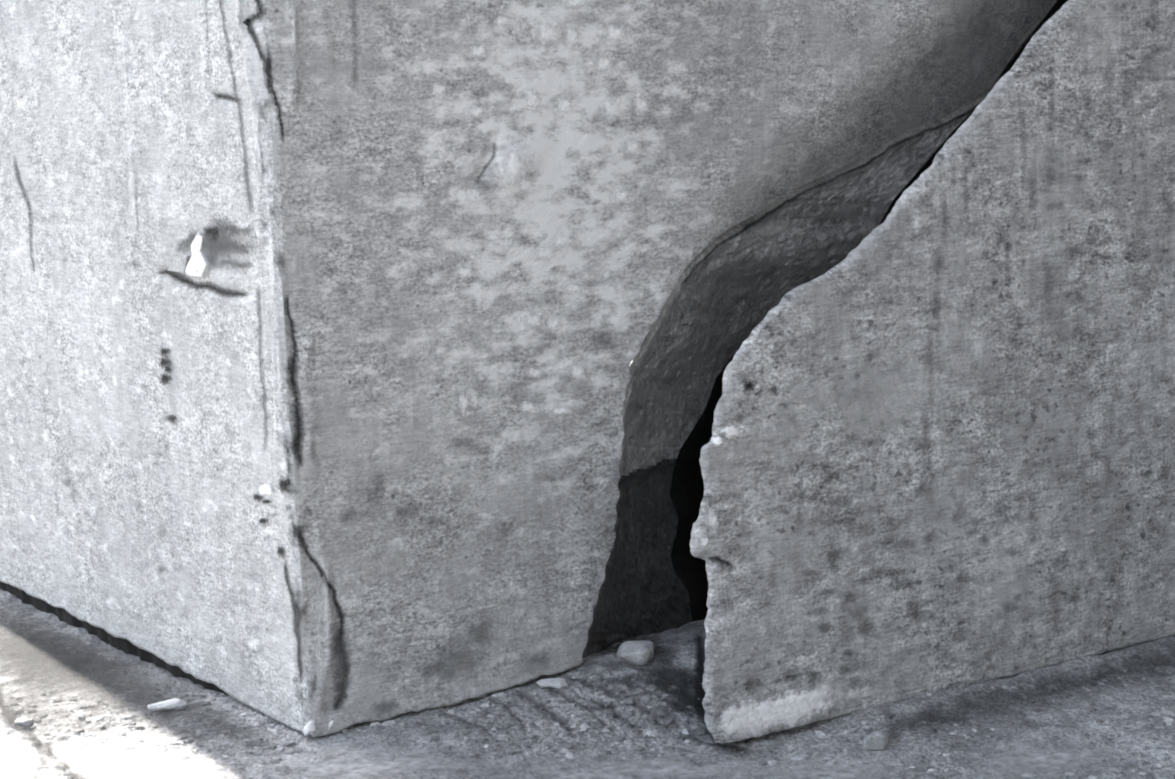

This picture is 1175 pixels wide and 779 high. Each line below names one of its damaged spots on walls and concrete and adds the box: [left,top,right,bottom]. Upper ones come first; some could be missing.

crack [213,0,284,208]
spalling [159,222,250,297]
crack [257,291,303,465]
crack [582,0,1068,753]
crack [284,526,349,710]